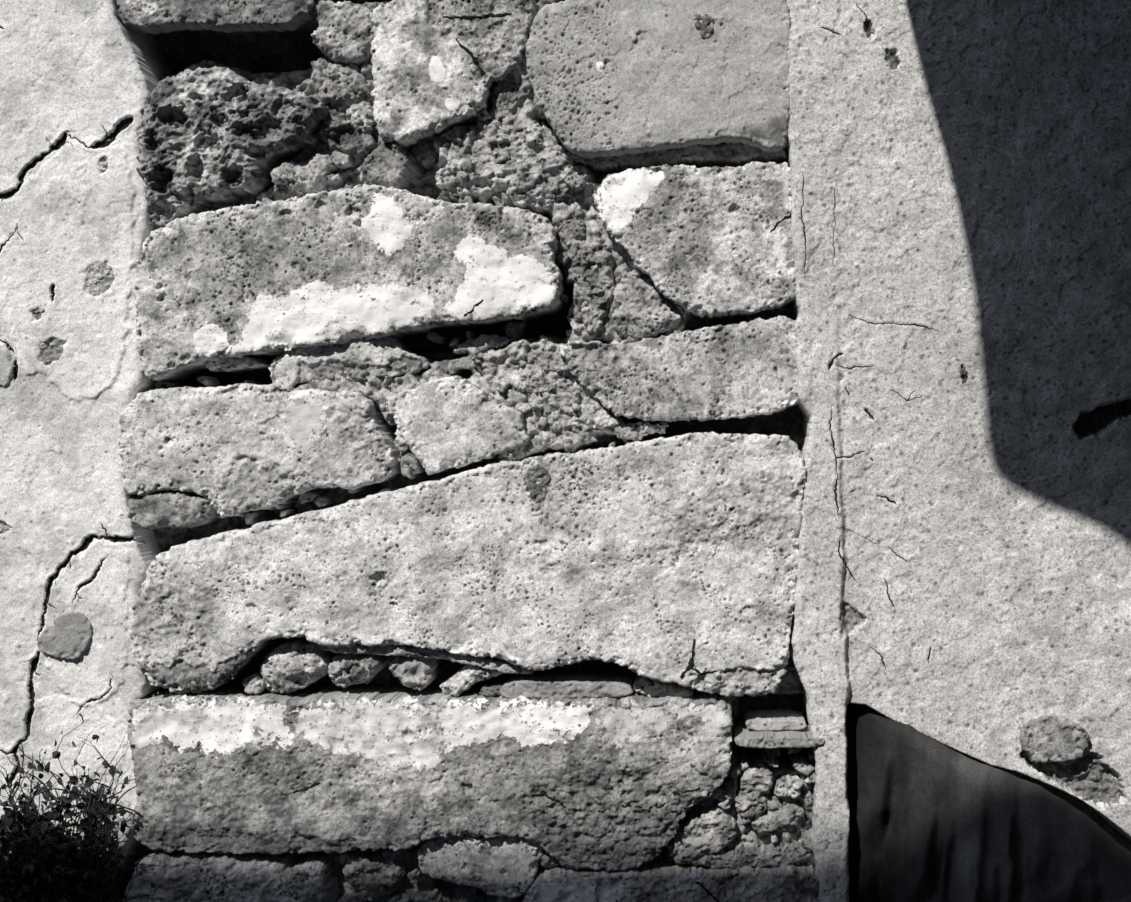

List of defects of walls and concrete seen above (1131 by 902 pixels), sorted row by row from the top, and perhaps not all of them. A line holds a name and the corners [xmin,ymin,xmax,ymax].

crack [0,117,134,253]
crack [0,339,18,381]
crack [0,524,146,789]